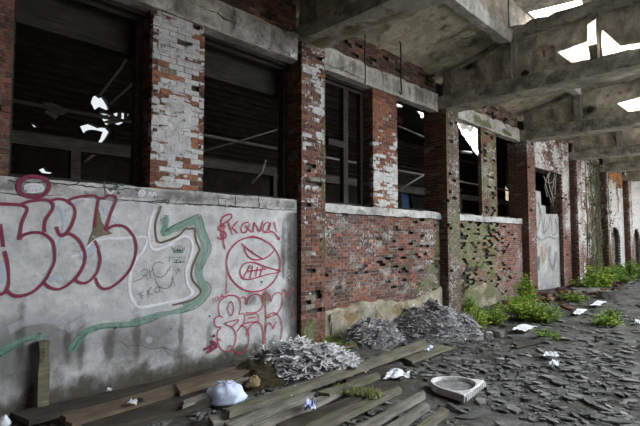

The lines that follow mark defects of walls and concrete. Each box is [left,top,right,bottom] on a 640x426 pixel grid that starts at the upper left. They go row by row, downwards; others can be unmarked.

peeling [154,12,204,73]
peeling [152,79,203,188]
peeling [302,122,325,150]
peeling [374,124,398,208]
peeling [535,140,569,172]
flaking render [330,311,359,337]
water stain [0,384,35,416]
water stain [49,340,272,404]